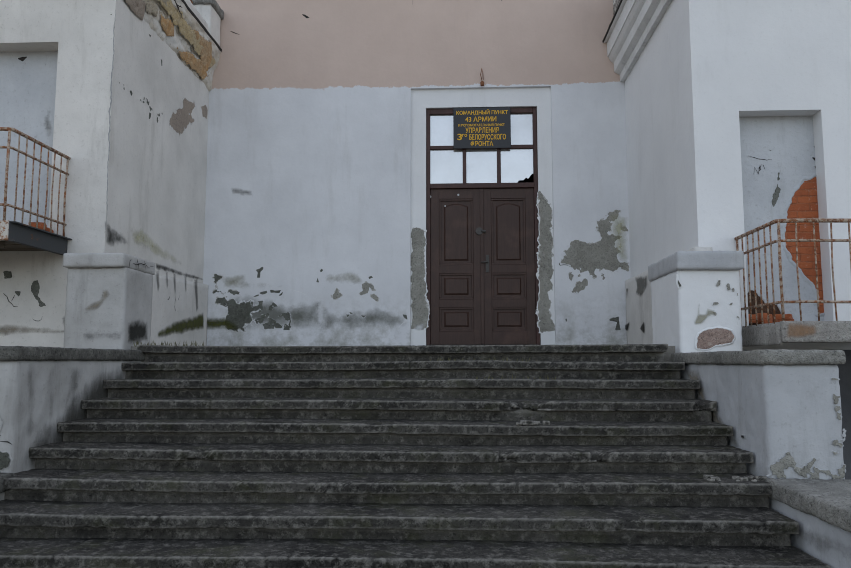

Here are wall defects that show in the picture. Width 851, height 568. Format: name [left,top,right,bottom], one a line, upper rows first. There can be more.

flaking render [125,0,216,81]
flaking render [119,82,208,138]
flaking render [211,273,293,335]
peeling [330,275,380,304]
flaking render [402,226,430,331]
flaking render [535,190,630,334]
flaking render [770,145,825,317]
spalling [0,449,13,471]
spalling [732,377,846,482]